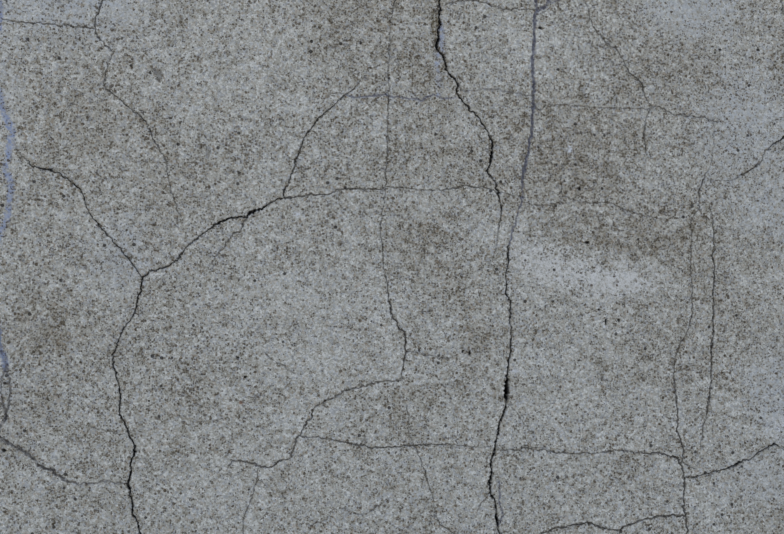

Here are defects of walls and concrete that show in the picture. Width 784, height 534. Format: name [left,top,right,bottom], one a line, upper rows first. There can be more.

crack [0,0,524,534]
crack [225,0,784,534]